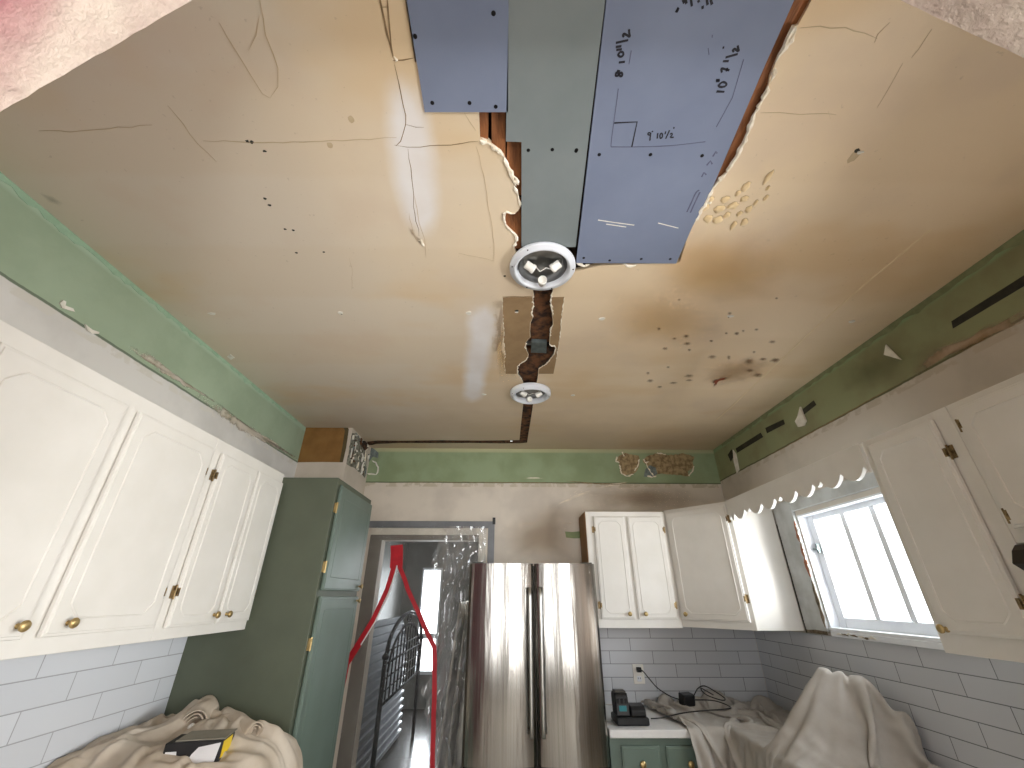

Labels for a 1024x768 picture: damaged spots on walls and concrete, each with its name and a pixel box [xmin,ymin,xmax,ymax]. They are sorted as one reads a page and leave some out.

crack [803,22,890,43]
crack [42,125,145,133]
crack [168,0,494,260]
peeling [480,138,521,248]
flaking render [217,408,288,453]
flaking render [615,452,694,478]